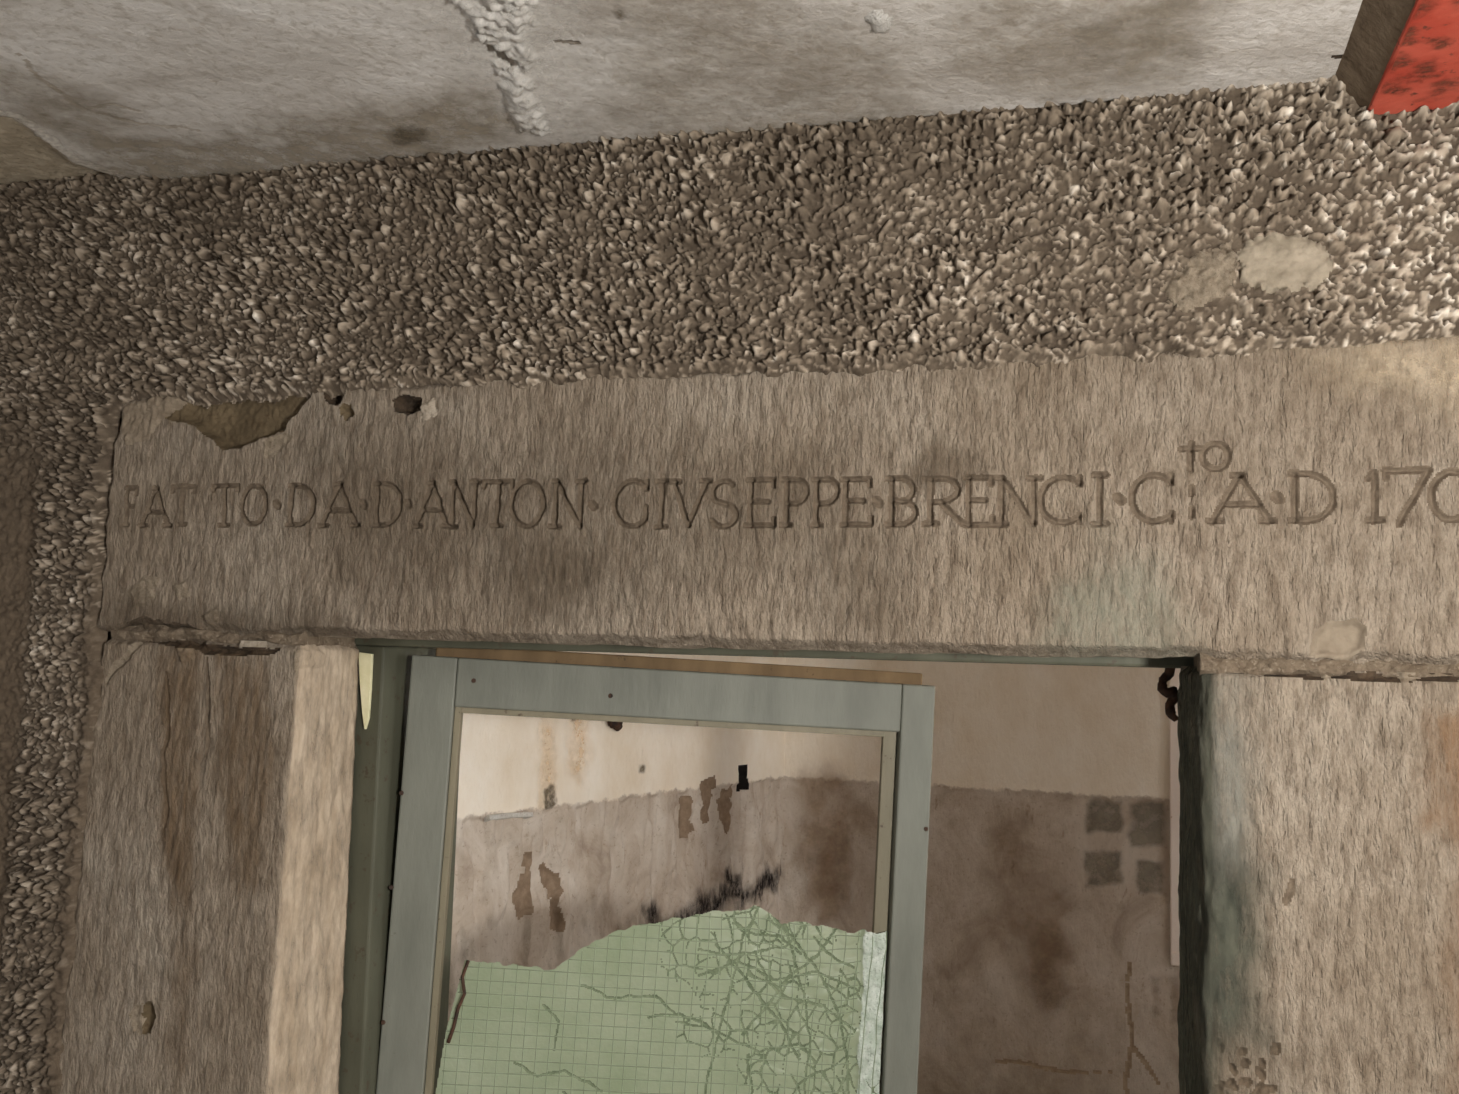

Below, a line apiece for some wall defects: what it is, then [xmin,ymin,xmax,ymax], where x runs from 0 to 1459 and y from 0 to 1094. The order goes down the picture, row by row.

spalling [165,395,311,459]
crack [105,615,280,838]
peeling [484,785,556,822]
peeling [678,764,749,838]
peeling [512,851,566,932]
water stain [642,867,781,924]
crack [659,905,880,1094]